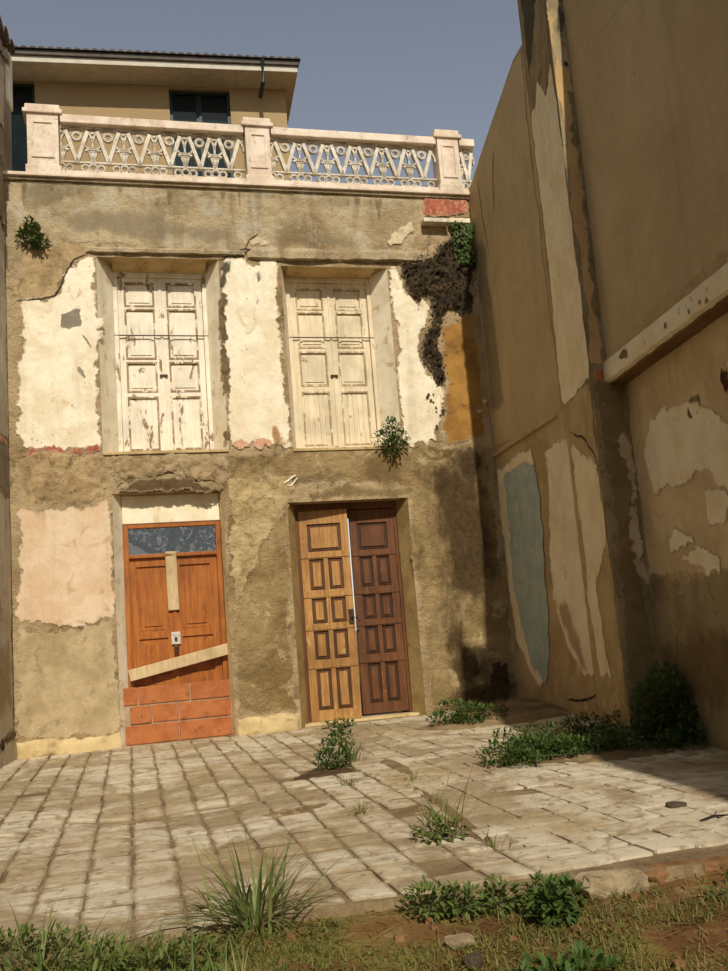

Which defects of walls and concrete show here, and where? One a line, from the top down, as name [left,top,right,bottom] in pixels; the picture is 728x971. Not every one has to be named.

flaking render [0,50,85,302]
crack [18,254,87,301]
flaking render [60,308,91,348]
crack [218,234,257,257]
flaking render [566,90,601,323]
spalling [720,360,728,393]
flaking render [0,431,295,610]
water stain [433,446,494,597]
flaking render [497,437,611,688]
flaking render [616,400,728,751]
water stain [449,623,511,705]